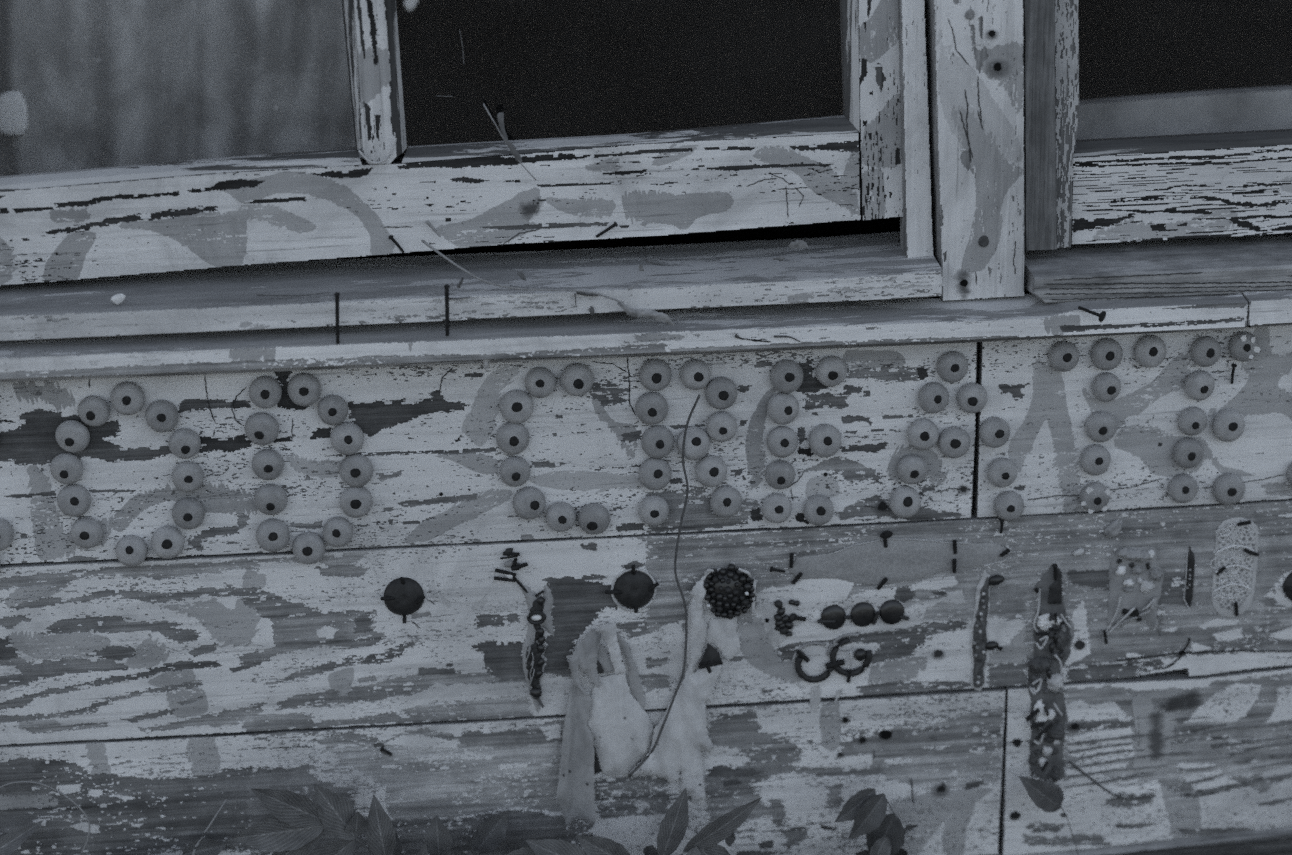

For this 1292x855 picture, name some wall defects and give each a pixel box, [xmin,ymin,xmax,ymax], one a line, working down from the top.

peeling [357,0,378,66]
peeling [969,16,988,74]
peeling [860,58,886,96]
peeling [364,81,395,141]
peeling [0,179,306,236]
peeling [311,167,387,190]
peeling [480,222,629,230]
peeling [397,120,872,199]
peeling [958,148,976,175]
peeling [1071,183,1292,241]
peeling [1073,148,1292,168]
peeling [0,336,1292,855]